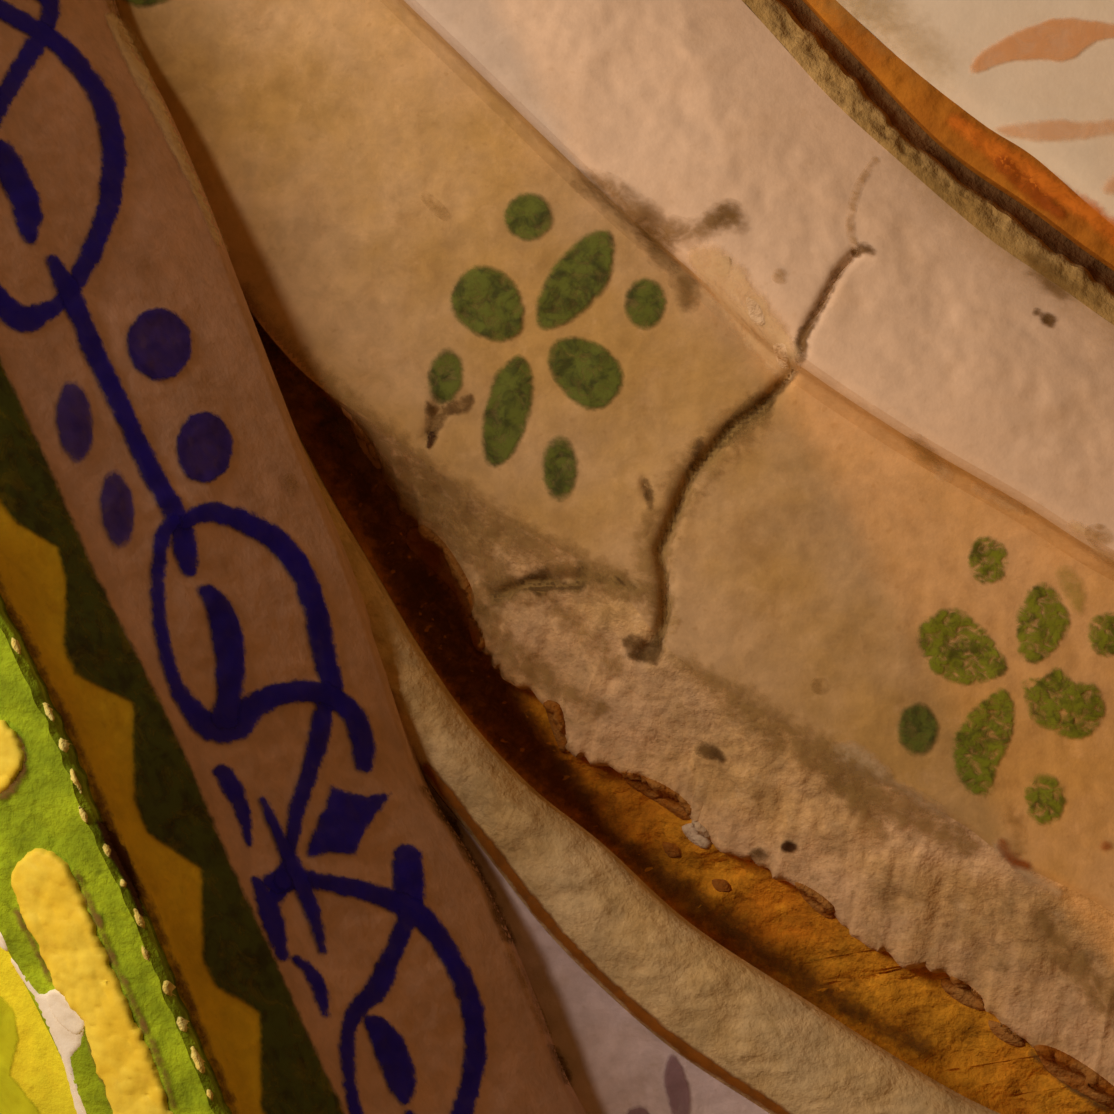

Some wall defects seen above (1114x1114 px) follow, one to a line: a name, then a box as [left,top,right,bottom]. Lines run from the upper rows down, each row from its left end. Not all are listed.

water stain [582,177,737,262]
crack [473,244,873,664]